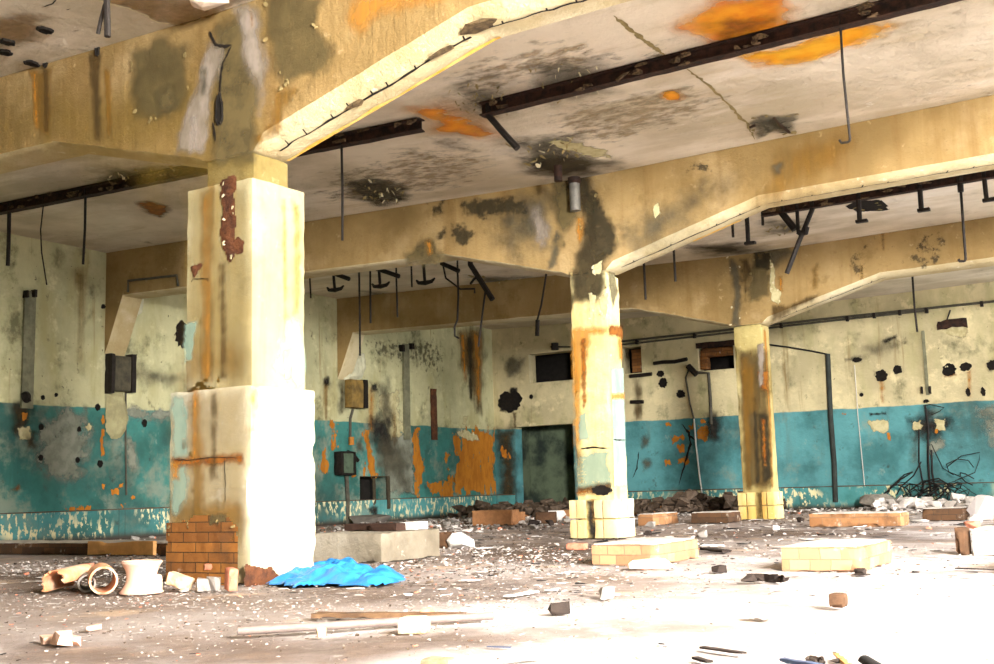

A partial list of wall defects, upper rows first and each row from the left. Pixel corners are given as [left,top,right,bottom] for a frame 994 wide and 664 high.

crack [614,16,665,55]
corrosion [678,0,890,65]
leakage [178,6,267,163]
corrosion [287,37,501,161]
crack [687,69,755,139]
spalling [220,175,244,262]
leakage [461,139,618,301]
corrosion [173,454,243,478]
leakage [370,384,404,440]
peeling [352,416,511,497]
corrosion [573,325,623,443]
peeling [664,419,709,466]